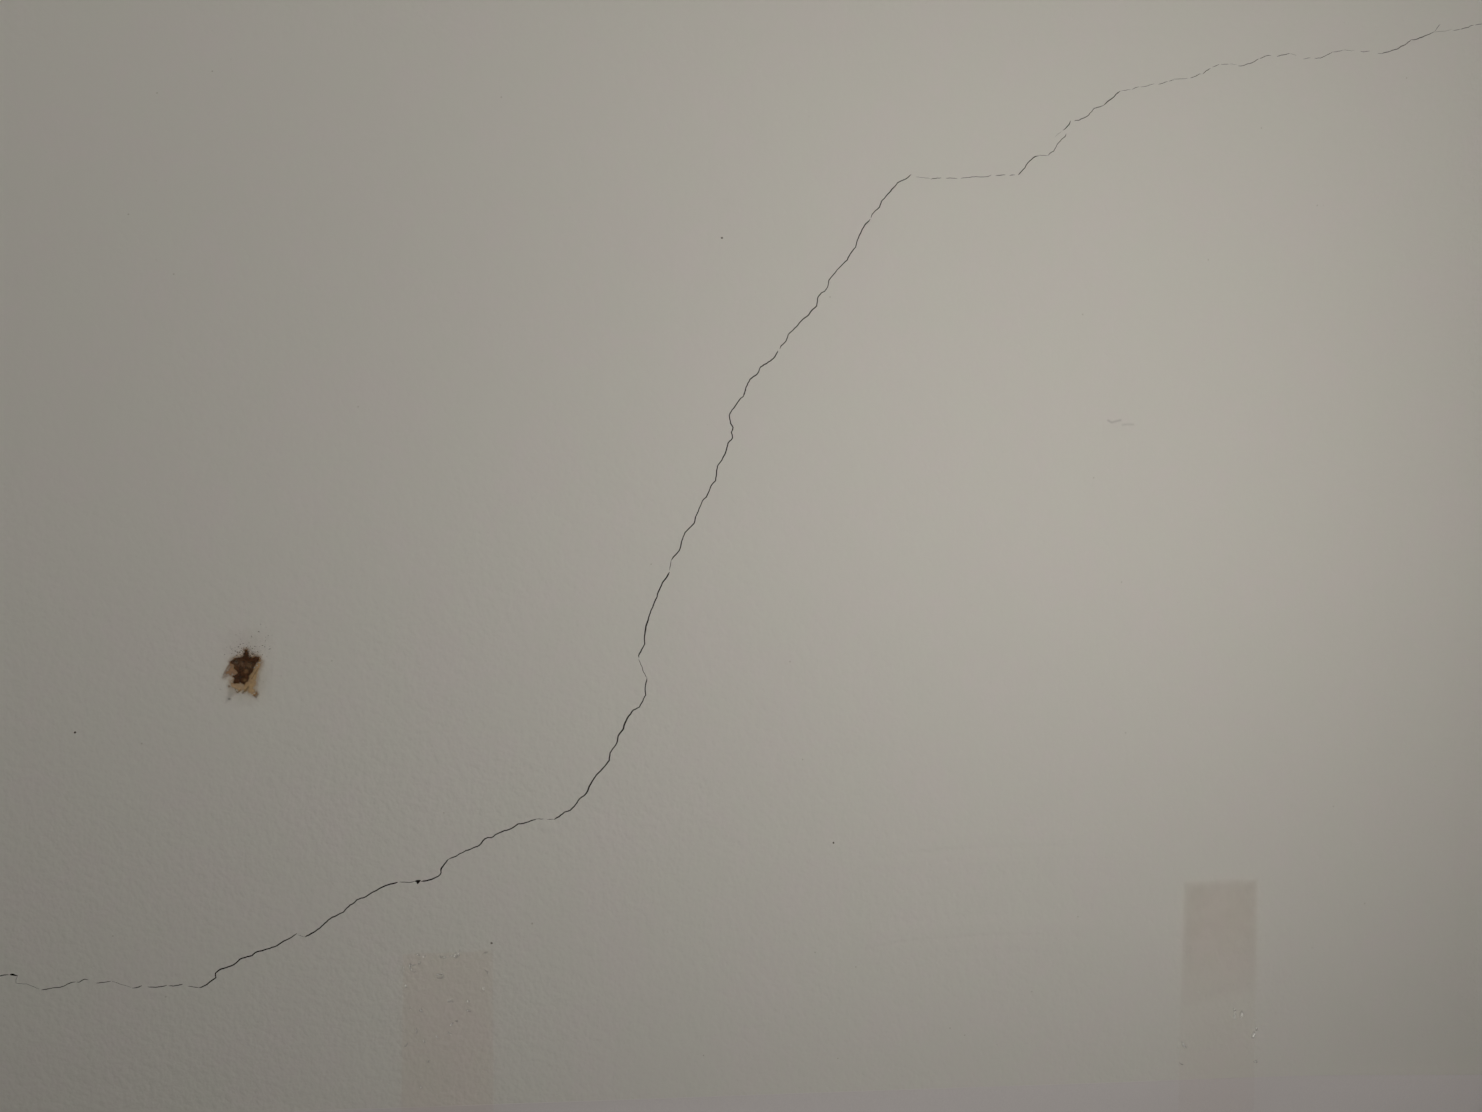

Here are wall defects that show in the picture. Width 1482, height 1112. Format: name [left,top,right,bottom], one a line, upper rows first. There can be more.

crack [0,56,963,990]